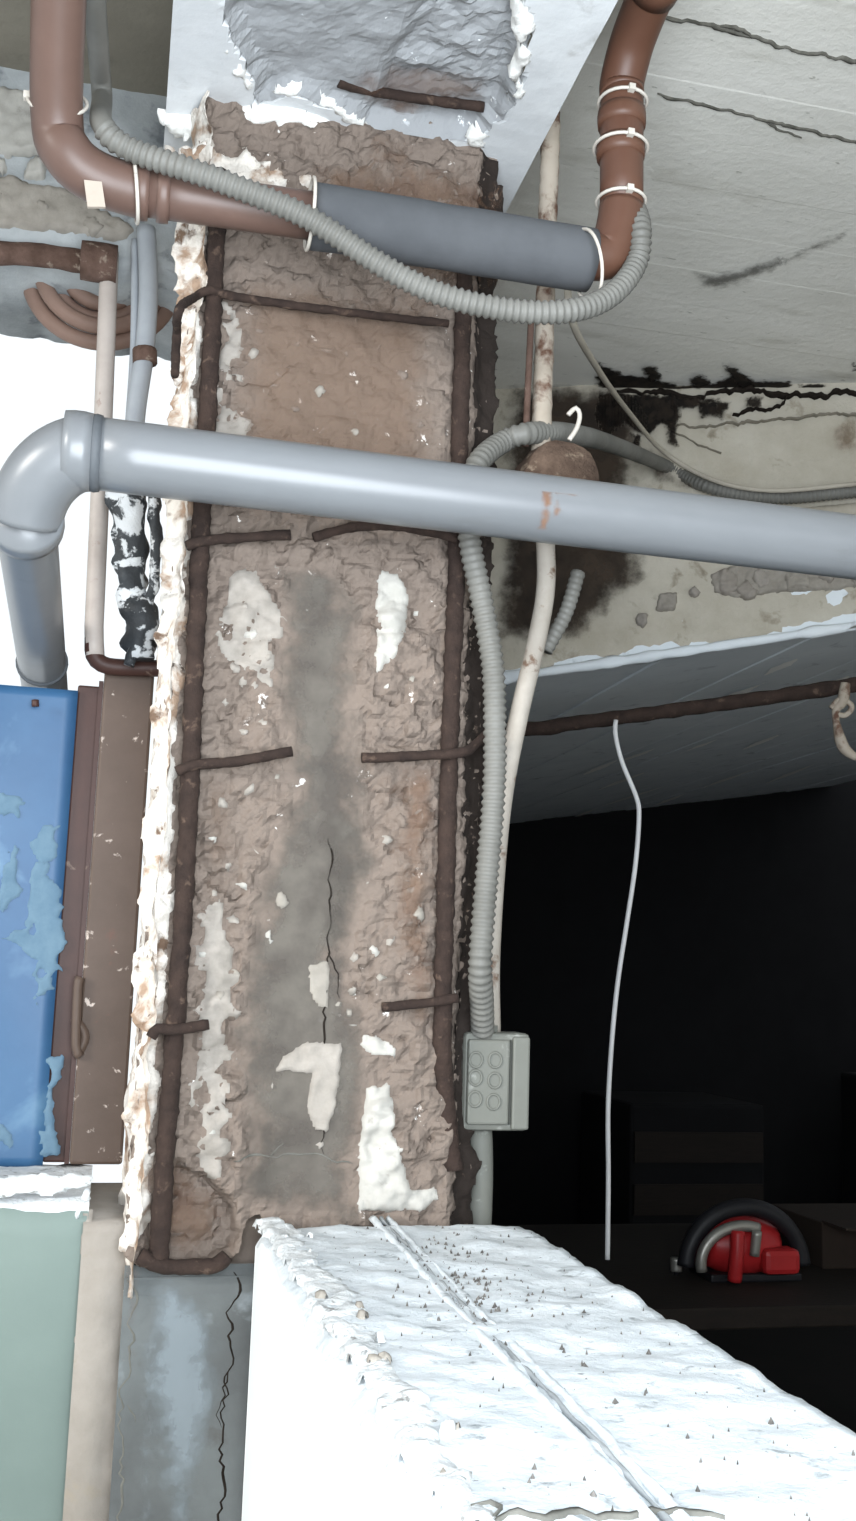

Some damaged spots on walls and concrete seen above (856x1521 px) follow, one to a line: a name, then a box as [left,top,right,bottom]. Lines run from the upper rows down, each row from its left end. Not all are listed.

peeling [0,86,134,242]
spalling [157,0,536,212]
crack [657,93,856,144]
crack [666,16,856,64]
spalling [167,222,499,464]
crack [617,385,856,454]
peeling [538,621,856,678]
peeling [635,566,856,628]
peeling [0,825,67,1005]
spalling [118,498,496,1521]
crack [216,1272,242,1521]